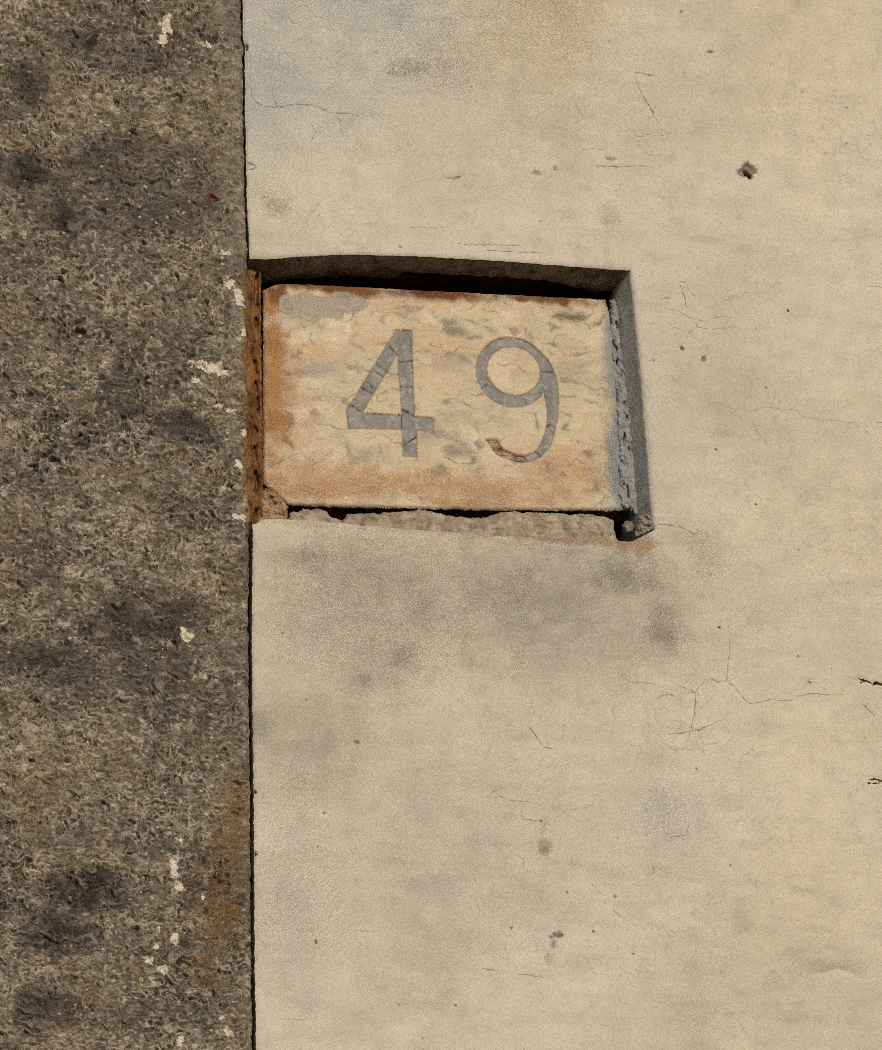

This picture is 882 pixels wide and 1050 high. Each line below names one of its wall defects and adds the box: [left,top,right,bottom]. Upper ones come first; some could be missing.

crack [569,641,851,766]